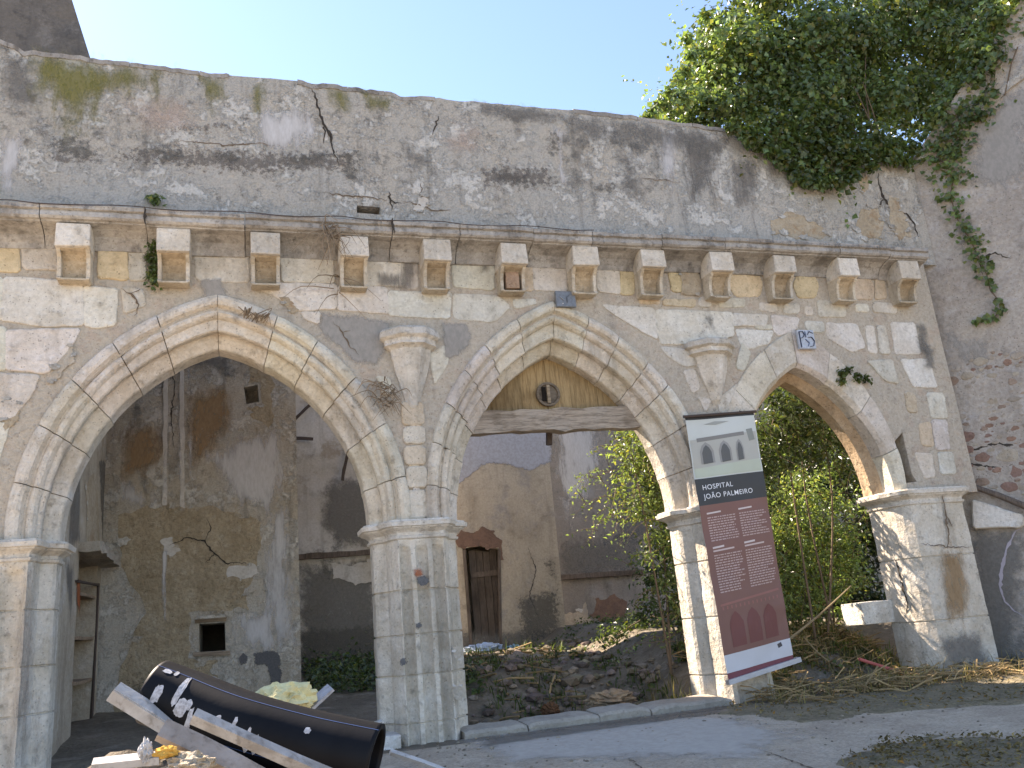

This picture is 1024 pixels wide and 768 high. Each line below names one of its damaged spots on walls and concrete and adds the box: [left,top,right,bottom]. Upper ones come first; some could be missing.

leakage [49,136,96,163]
leakage [116,110,362,179]
crack [312,90,339,164]
leakage [481,121,726,193]
peeling [770,211,833,240]
peeling [851,175,913,241]
crack [878,173,919,237]
leakage [184,357,233,375]
leakage [179,390,376,673]
crack [924,496,967,549]
peeling [85,473,262,693]
crack [894,555,908,614]